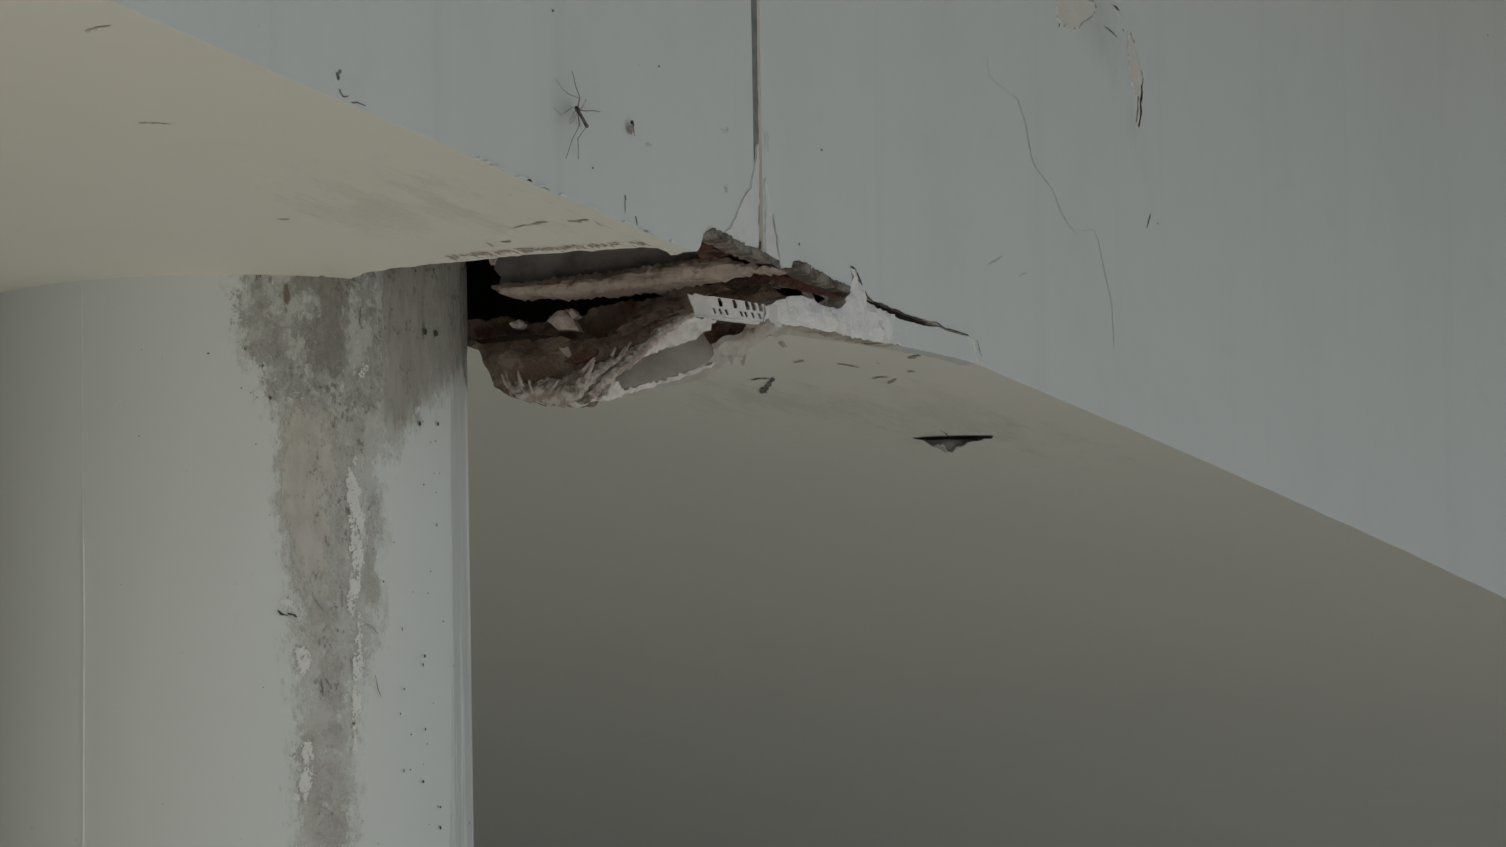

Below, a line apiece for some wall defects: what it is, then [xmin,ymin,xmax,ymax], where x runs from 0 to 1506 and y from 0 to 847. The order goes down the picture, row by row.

peeling [1127,30,1144,128]
crack [988,67,1115,349]
flaking render [466,221,977,408]
crack [754,266,982,394]
peeling [912,430,993,453]
leakage [234,261,468,847]